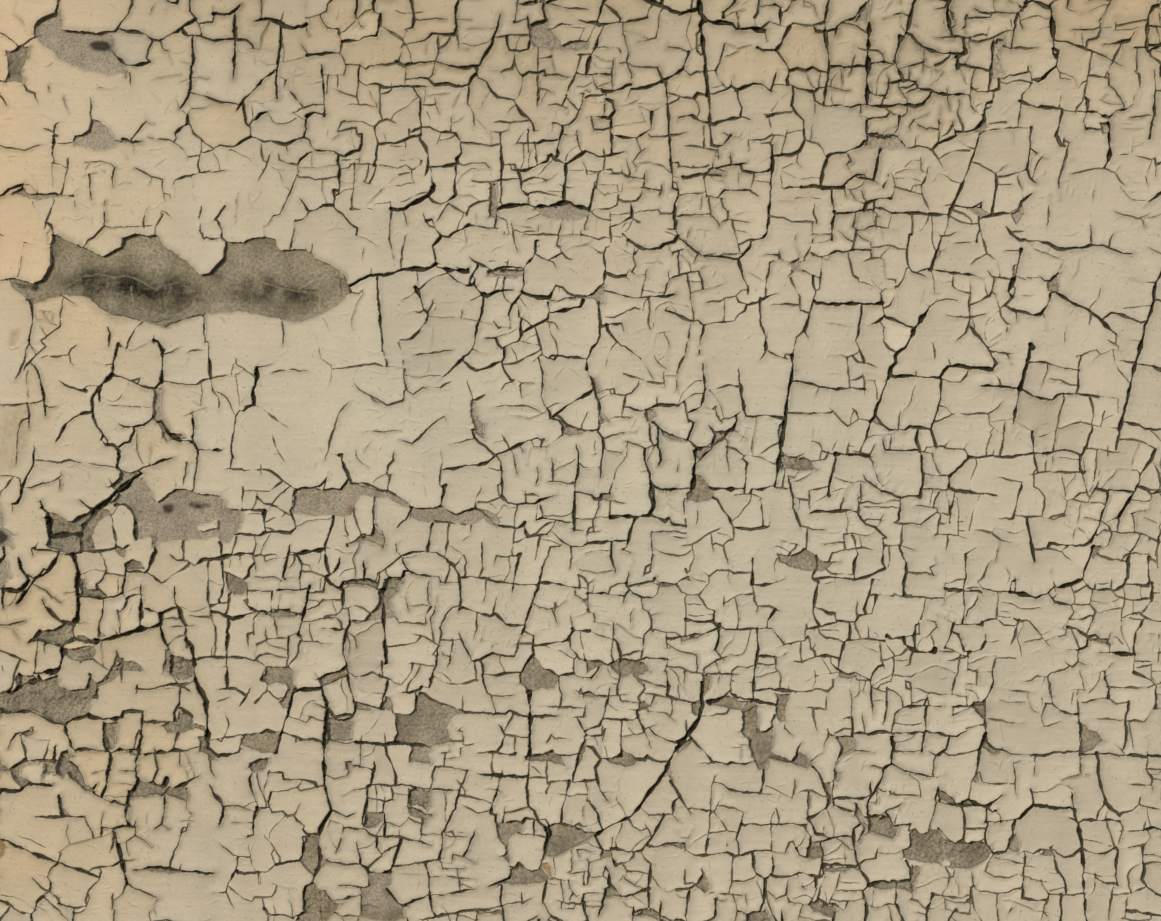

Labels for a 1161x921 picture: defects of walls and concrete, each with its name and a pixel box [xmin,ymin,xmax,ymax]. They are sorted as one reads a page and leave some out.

peeling [5,13,125,83]
crack [1106,0,1161,86]
crack [0,122,77,236]
peeling [9,228,349,327]
crack [1006,225,1132,254]
crack [0,272,198,464]
crack [0,446,82,511]
peeling [47,471,243,553]
peeling [327,694,463,764]
peeling [0,749,93,793]
crack [134,792,215,875]
peeling [854,804,991,897]